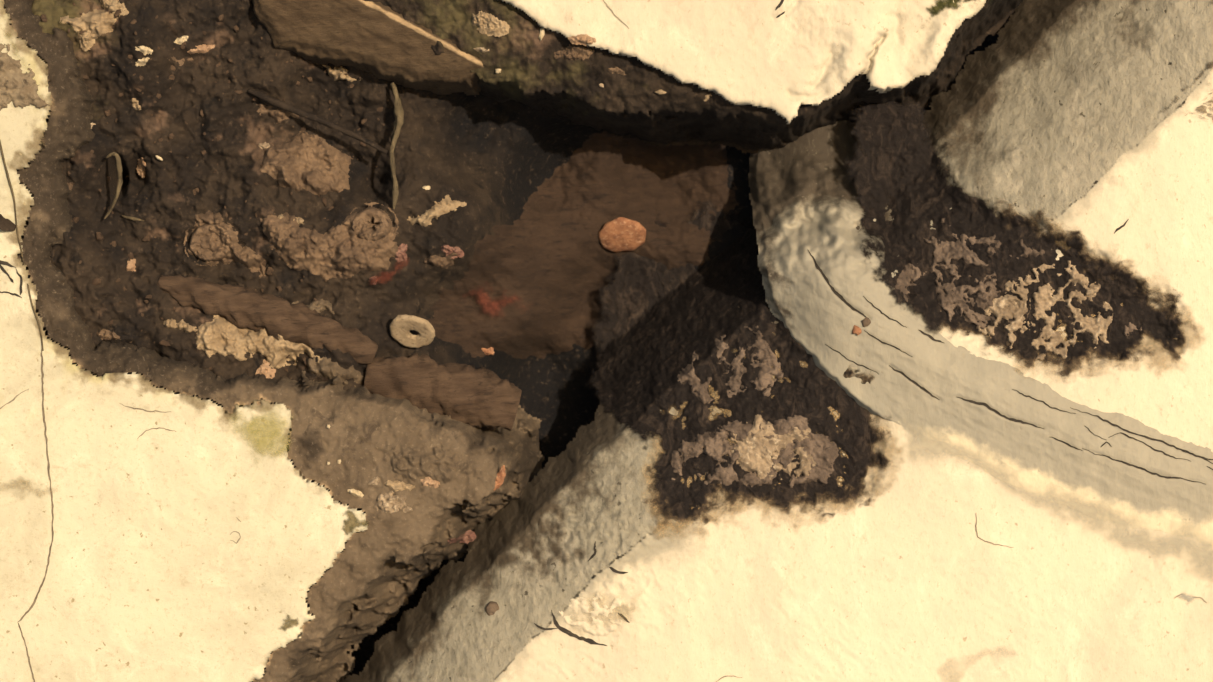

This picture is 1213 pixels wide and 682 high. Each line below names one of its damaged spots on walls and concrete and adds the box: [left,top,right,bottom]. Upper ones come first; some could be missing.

spalling [0,0,545,682]
spalling [31,0,1024,469]
crack [807,249,1213,484]
crack [534,610,607,646]
flaking render [559,593,630,637]
crack [588,541,628,574]